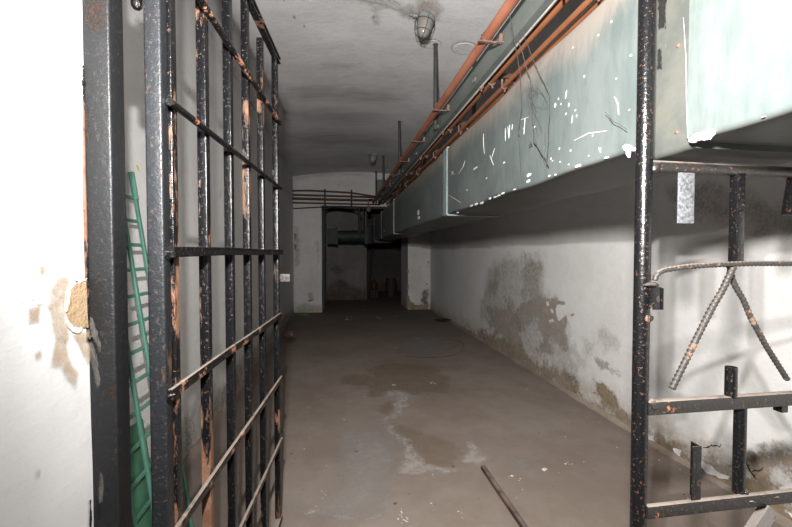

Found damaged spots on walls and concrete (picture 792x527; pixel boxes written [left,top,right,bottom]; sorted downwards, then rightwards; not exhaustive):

spalling [64,278,89,333]
damp [479,256,582,396]
damp [332,390,457,520]